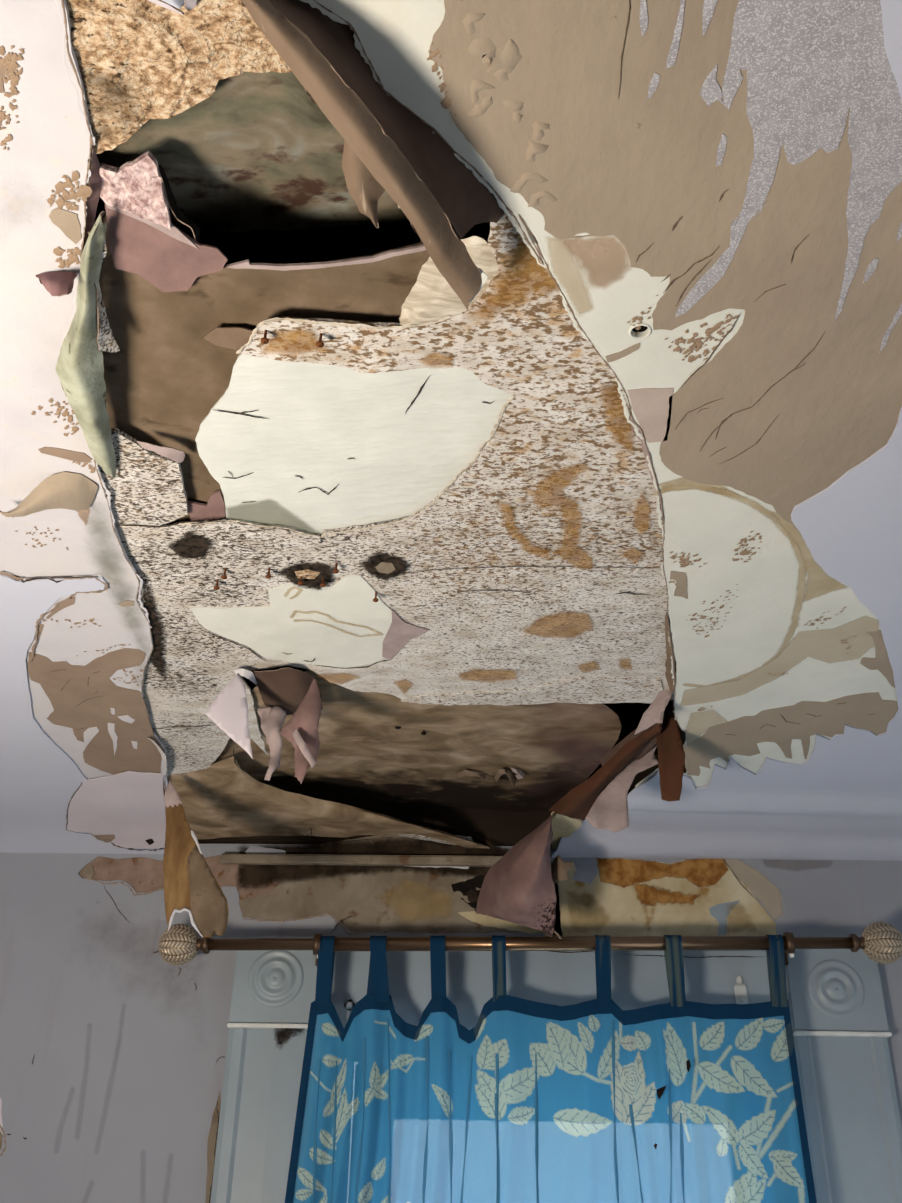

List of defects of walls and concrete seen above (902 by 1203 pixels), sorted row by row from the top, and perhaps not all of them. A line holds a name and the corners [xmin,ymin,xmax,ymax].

peeling [300,0,902,788]
peeling [0,0,168,851]
corrosion [500,464,592,570]
corrosion [635,497,649,534]
peeling [295,570,320,579]
leakage [359,554,410,581]
corrosion [524,613,592,638]
corrosion [579,662,599,673]
corrosion [619,659,631,670]
spalling [551,812,582,849]
leakage [238,838,509,888]
spalling [239,858,776,936]